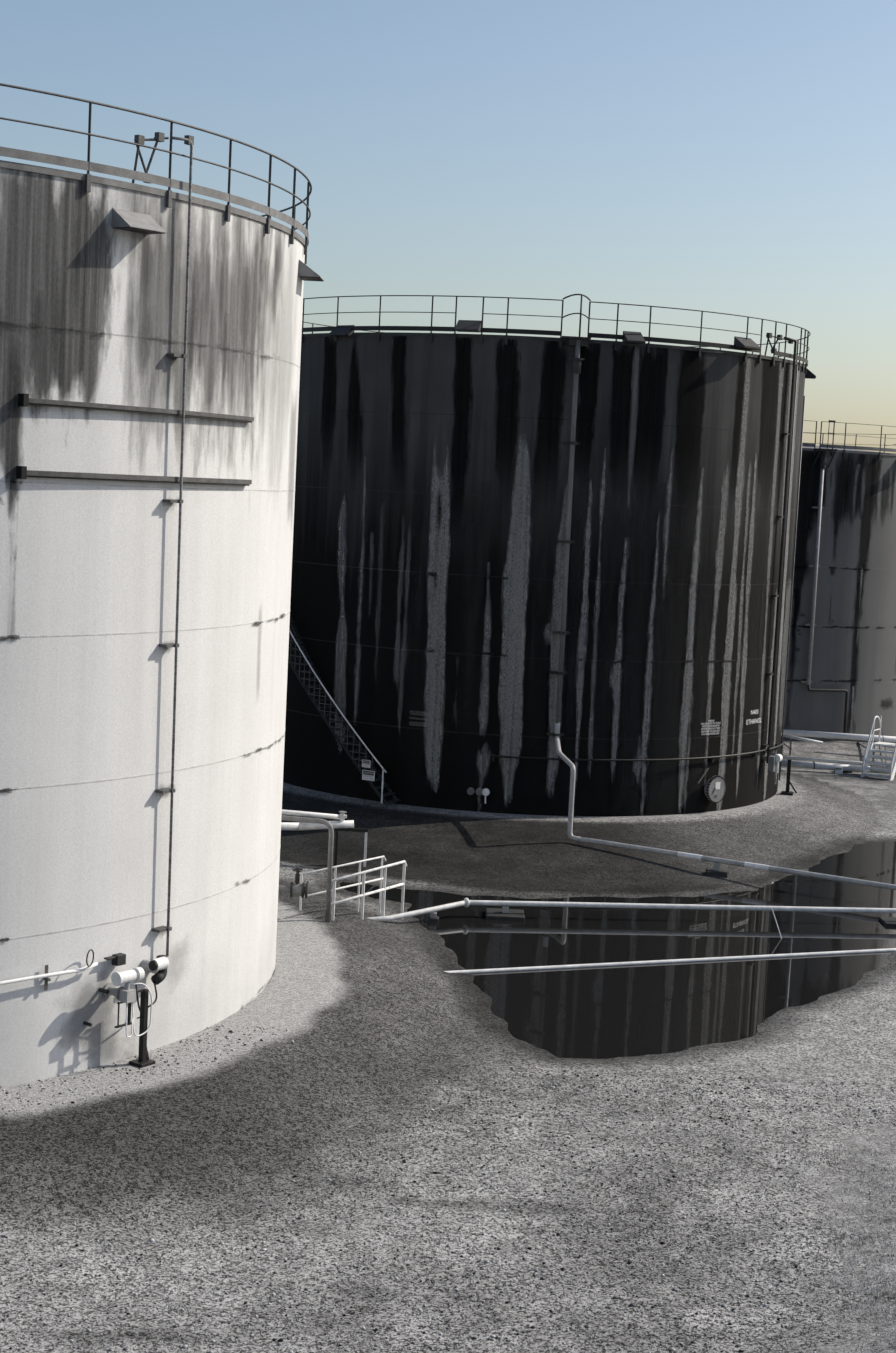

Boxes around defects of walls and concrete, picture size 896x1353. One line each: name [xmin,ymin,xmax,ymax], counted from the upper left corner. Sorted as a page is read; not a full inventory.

leakage [0,169,111,509]
leakage [128,191,280,428]
leakage [321,336,363,456]
leakage [392,336,406,463]
leakage [451,337,473,506]
leakage [496,339,519,466]
leakage [534,341,705,474]
leakage [732,361,745,476]
leakage [759,359,789,472]
leakage [791,450,894,733]